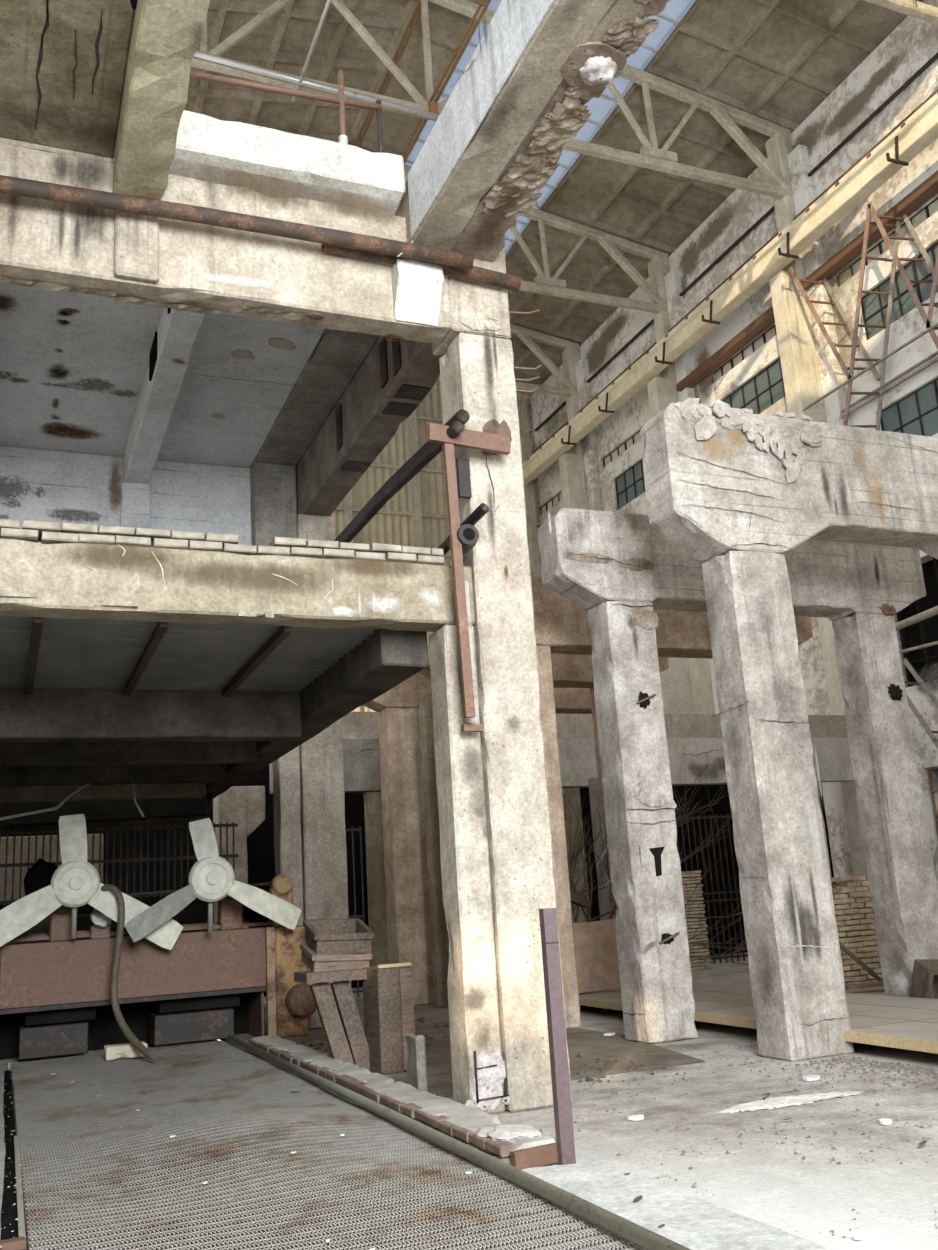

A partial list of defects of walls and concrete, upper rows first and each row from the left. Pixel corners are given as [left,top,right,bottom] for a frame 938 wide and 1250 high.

crack [35,0,103,130]
spalling [482,0,660,225]
peeling [679,209,732,298]
peeling [674,348,823,483]